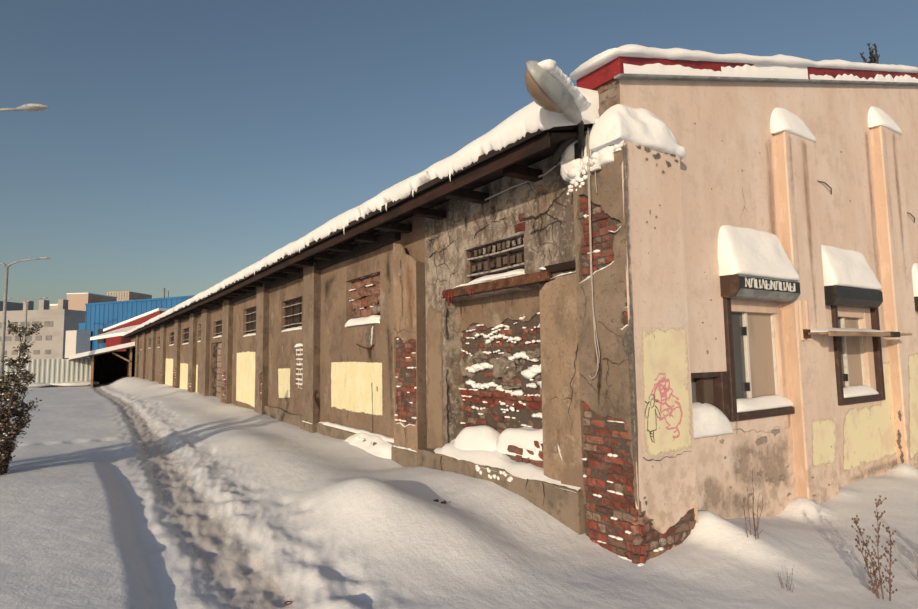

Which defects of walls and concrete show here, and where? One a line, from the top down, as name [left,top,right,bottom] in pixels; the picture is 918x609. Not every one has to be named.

crack [428,173,586,307]
spalling [578,197,622,284]
spalling [395,337,417,427]
crack [549,288,628,453]
spalling [581,400,696,566]